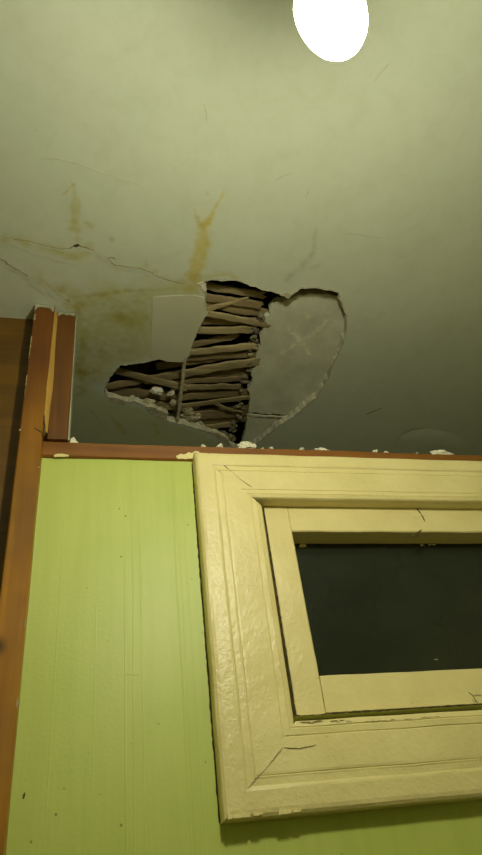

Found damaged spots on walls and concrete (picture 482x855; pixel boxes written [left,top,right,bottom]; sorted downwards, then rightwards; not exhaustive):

leakage [0,180,183,389]
crack [0,237,188,352]
flaking render [70,279,347,460]